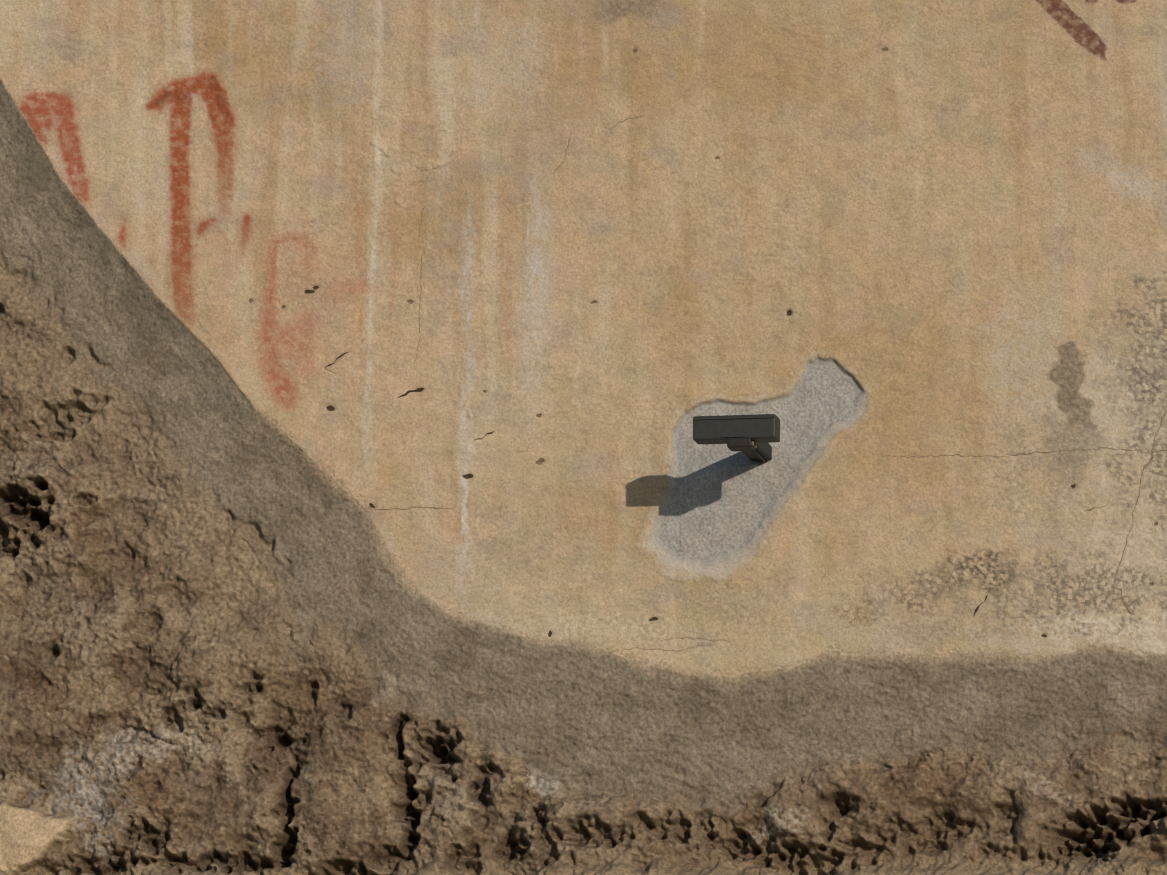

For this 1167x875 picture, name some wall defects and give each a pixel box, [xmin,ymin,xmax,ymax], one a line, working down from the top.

flaking render [635,348,874,584]
damp [797,261,1167,656]
crack [882,405,1167,615]